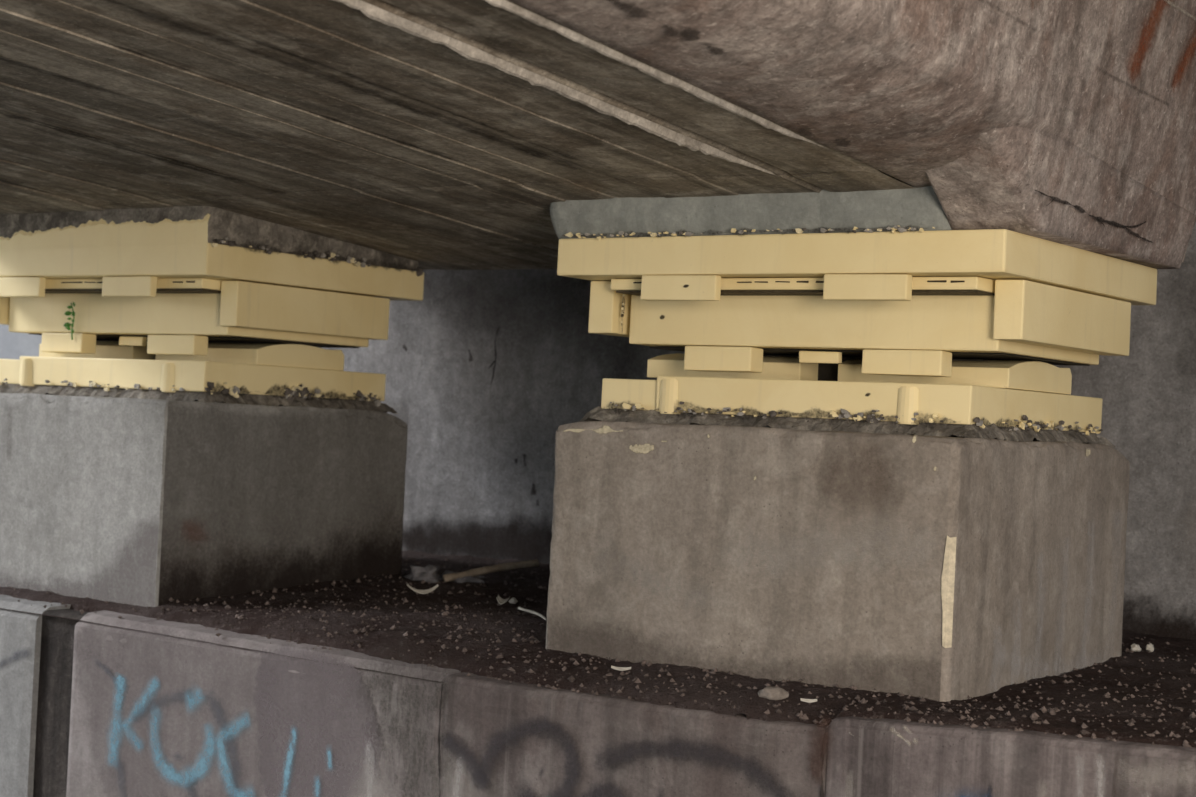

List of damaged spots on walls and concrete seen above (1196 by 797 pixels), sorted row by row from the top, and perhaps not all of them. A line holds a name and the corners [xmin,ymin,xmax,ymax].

rust [1132,0,1166,76]
crack [1035,190,1152,242]